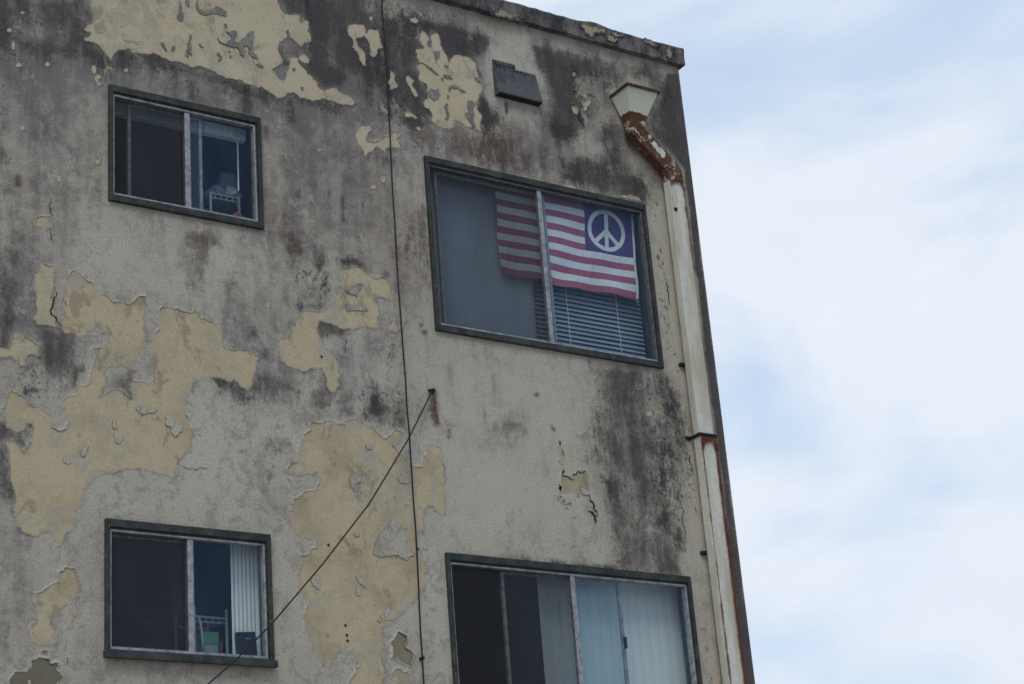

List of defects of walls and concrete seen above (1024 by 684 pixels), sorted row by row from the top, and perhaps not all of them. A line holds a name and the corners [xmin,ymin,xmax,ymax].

peeling [82,0,357,108]
peeling [345,16,385,66]
peeling [353,16,484,158]
water stain [533,45,652,157]
water stain [562,122,650,199]
peeling [276,266,407,393]
peeling [0,260,261,548]
crack [554,430,598,523]
water stain [552,362,685,574]
peeling [285,418,448,684]
corrosion [701,436,747,684]
peeling [7,565,82,684]